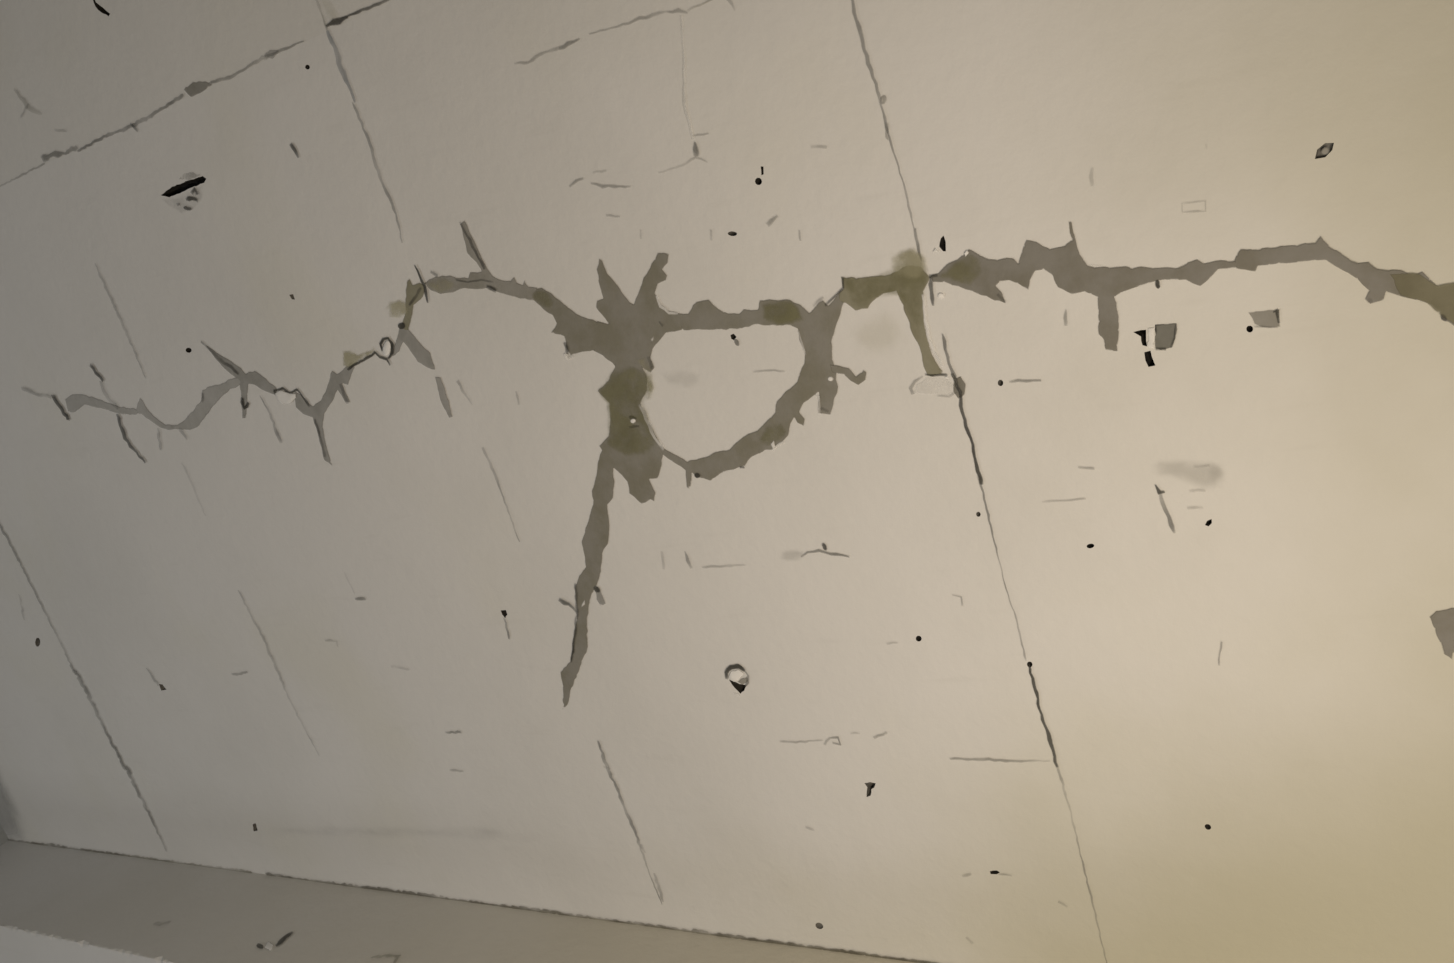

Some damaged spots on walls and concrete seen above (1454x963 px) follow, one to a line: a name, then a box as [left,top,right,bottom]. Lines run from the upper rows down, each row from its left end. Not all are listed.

crack [326,3,380,27]
crack [165,82,211,108]
crack [42,124,136,160]
spalling [1246,310,1280,332]
spalling [1134,324,1177,367]
crack [52,221,1454,707]
peeling [1430,608,1454,658]
crack [1028,664,1058,767]
crack [104,728,155,826]
crack [335,883,424,896]
crack [469,901,568,916]
crack [715,933,931,963]